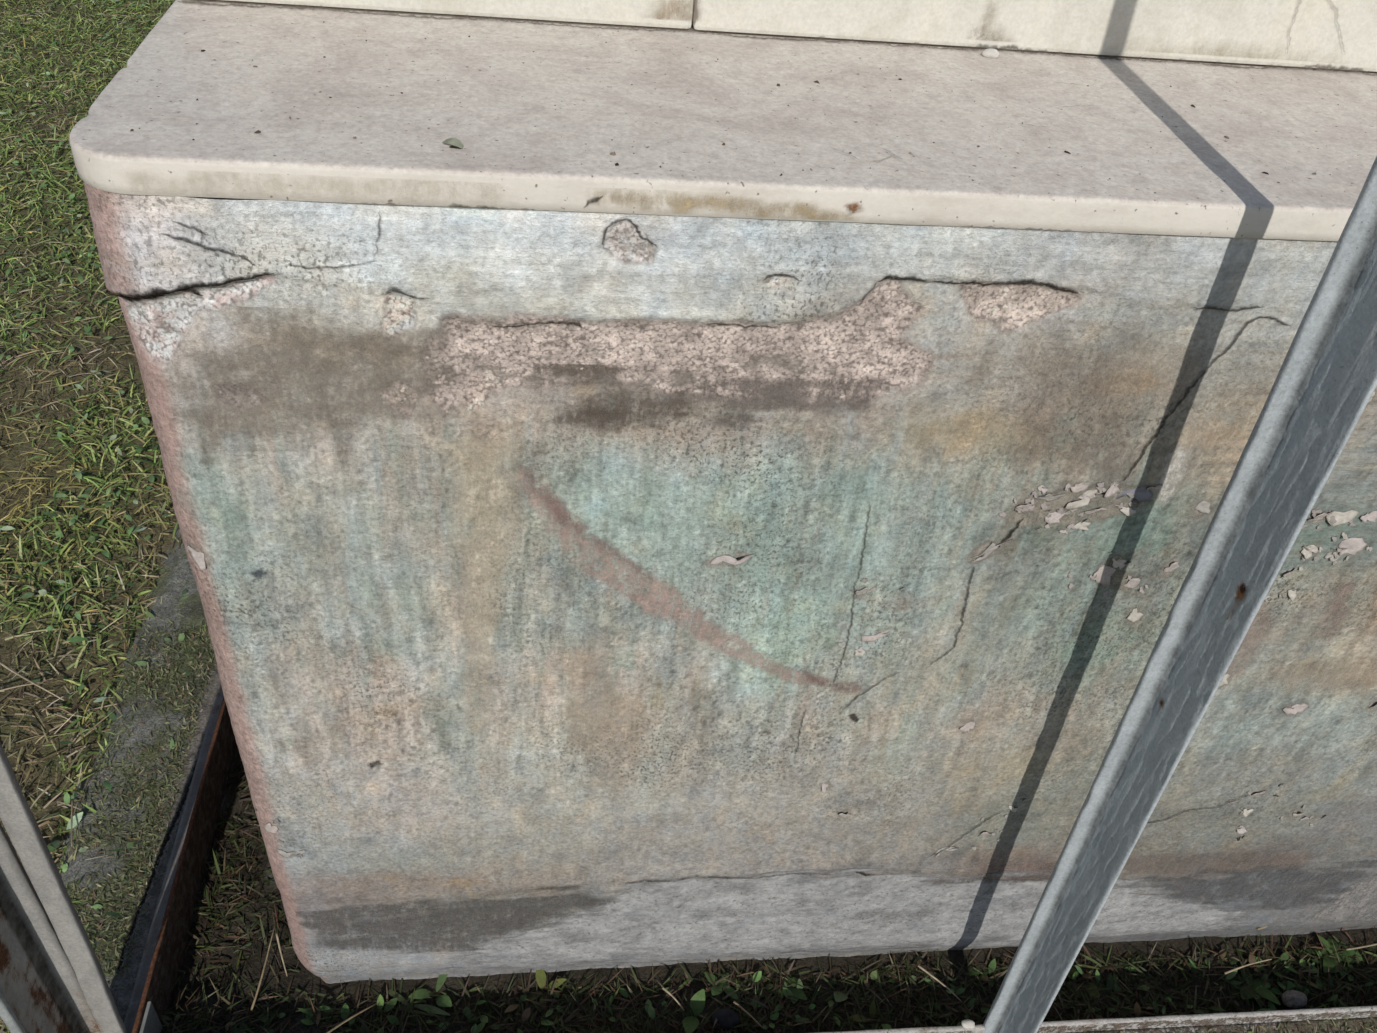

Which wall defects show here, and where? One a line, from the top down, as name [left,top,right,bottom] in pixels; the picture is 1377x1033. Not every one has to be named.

crack [108,203,431,303]
damp [191,332,447,448]
damp [534,364,623,379]
spalling [379,280,933,418]
damp [555,378,890,428]
spalling [960,283,1080,332]
crack [1124,306,1290,481]
crack [1000,518,1024,544]
peeling [968,481,1163,563]
peeling [1265,509,1377,601]
crack [931,568,975,665]
damp [297,886,604,954]